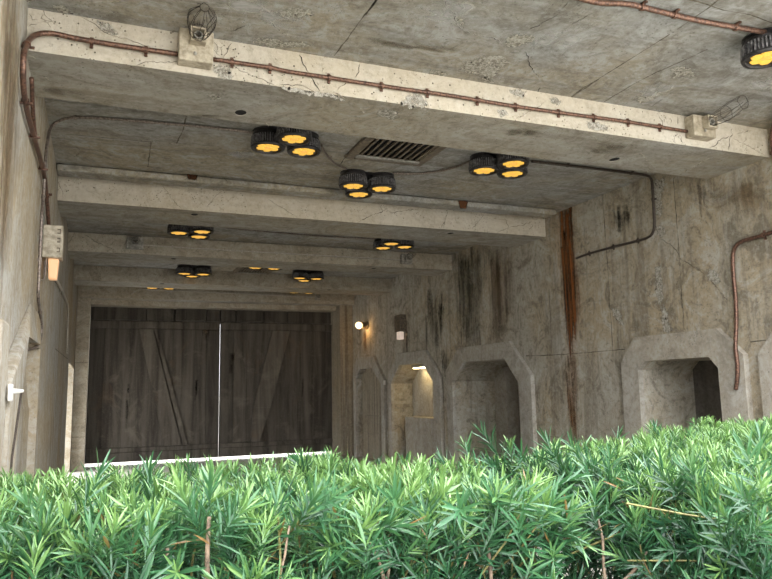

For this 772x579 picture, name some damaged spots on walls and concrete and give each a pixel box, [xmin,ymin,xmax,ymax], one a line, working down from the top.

crack [28,0,177,66]
crack [214,15,360,98]
corrosion [560,207,580,436]